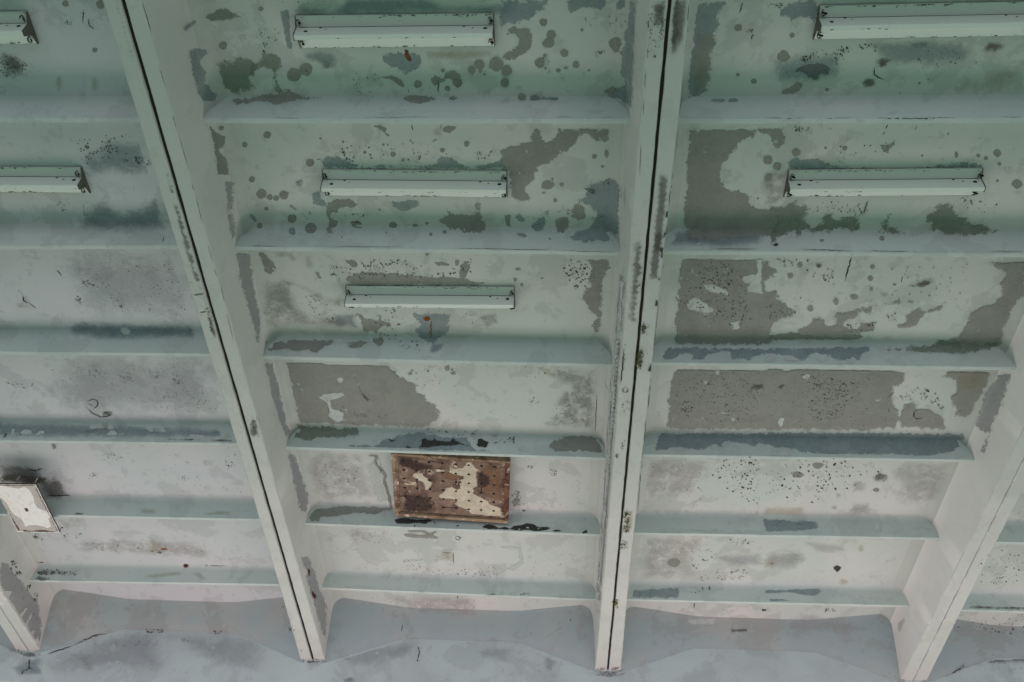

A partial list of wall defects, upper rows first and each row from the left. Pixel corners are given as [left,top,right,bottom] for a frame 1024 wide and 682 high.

peeling [500,129,609,202]
peeling [548,203,585,240]
peeling [683,128,785,246]
peeling [674,259,794,346]
peeling [798,300,942,339]
peeling [942,262,1024,346]
peeling [266,339,489,448]
peeling [666,369,989,432]